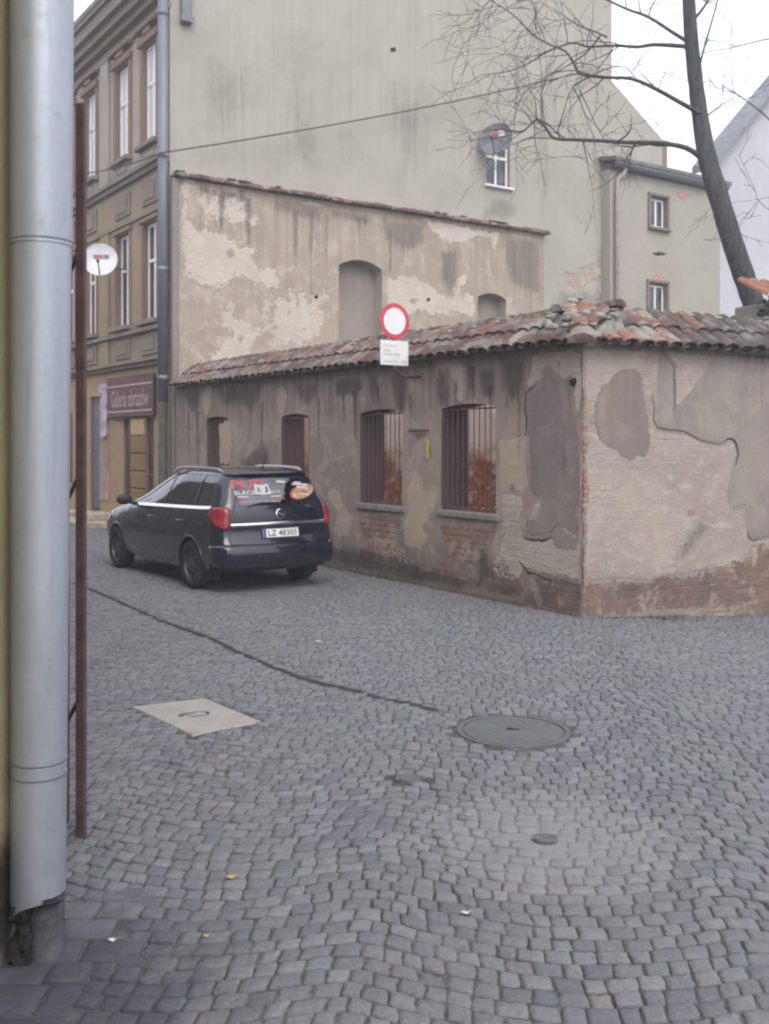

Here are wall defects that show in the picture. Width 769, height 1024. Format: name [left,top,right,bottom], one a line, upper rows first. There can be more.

peeling [179,178,333,361]
peeling [385,272,476,326]
spalling [327,346,769,618]
crack [652,353,739,465]